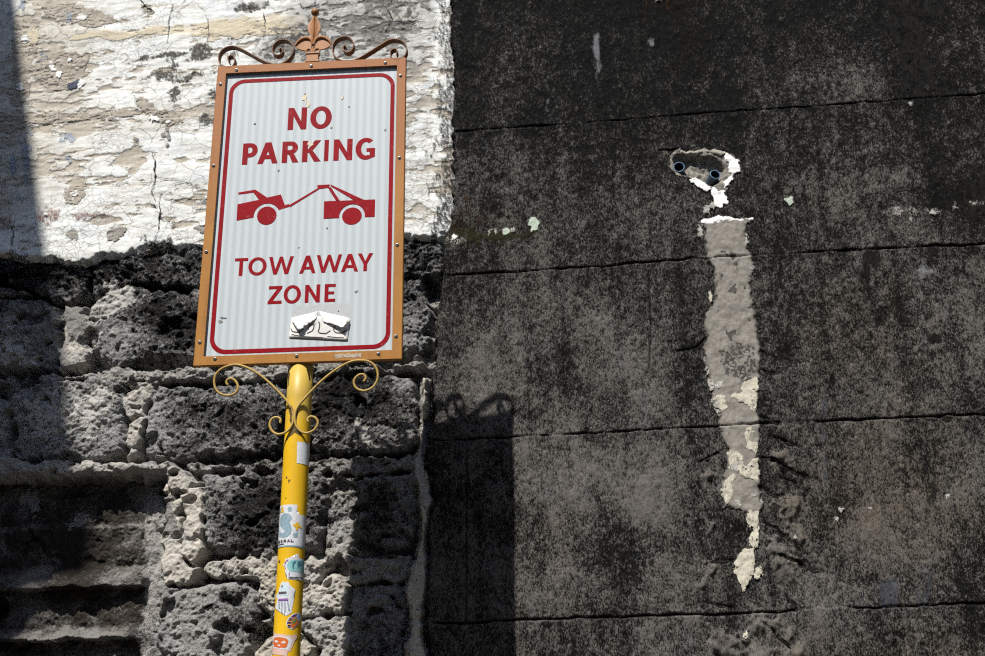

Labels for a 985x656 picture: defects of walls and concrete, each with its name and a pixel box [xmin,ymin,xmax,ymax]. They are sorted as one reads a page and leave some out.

peeling [0,2,183,147]
peeling [63,181,87,204]
spalling [669,148,740,192]
peeling [106,226,126,241]
peeling [703,356,759,416]
peeling [720,427,763,592]